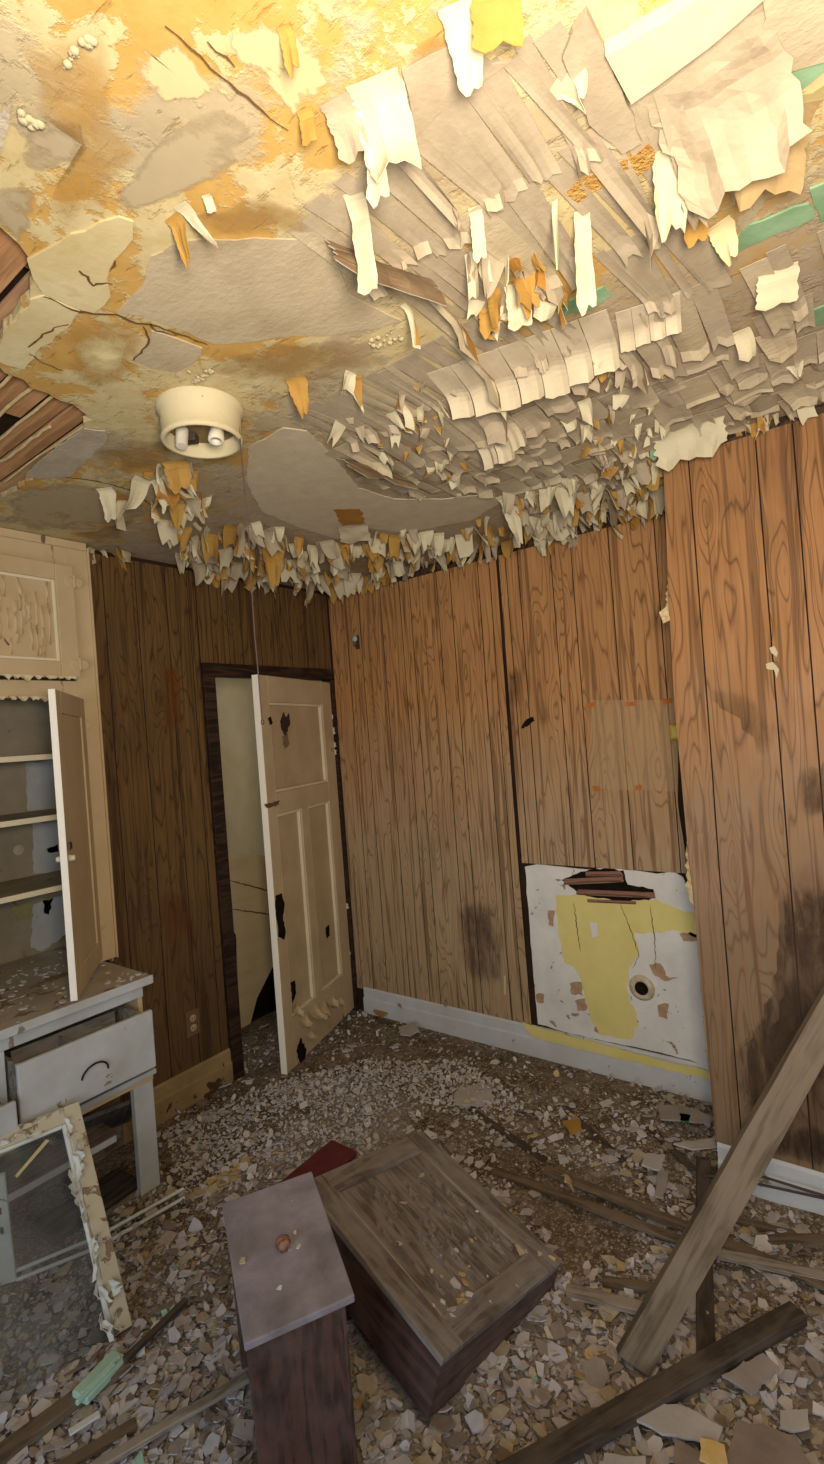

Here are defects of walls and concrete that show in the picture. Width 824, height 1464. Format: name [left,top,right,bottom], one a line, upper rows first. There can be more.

crack [28,260,208,371]
flaking render [0,0,824,609]
flaking render [525,864,709,1065]
damp [750,906,824,1103]